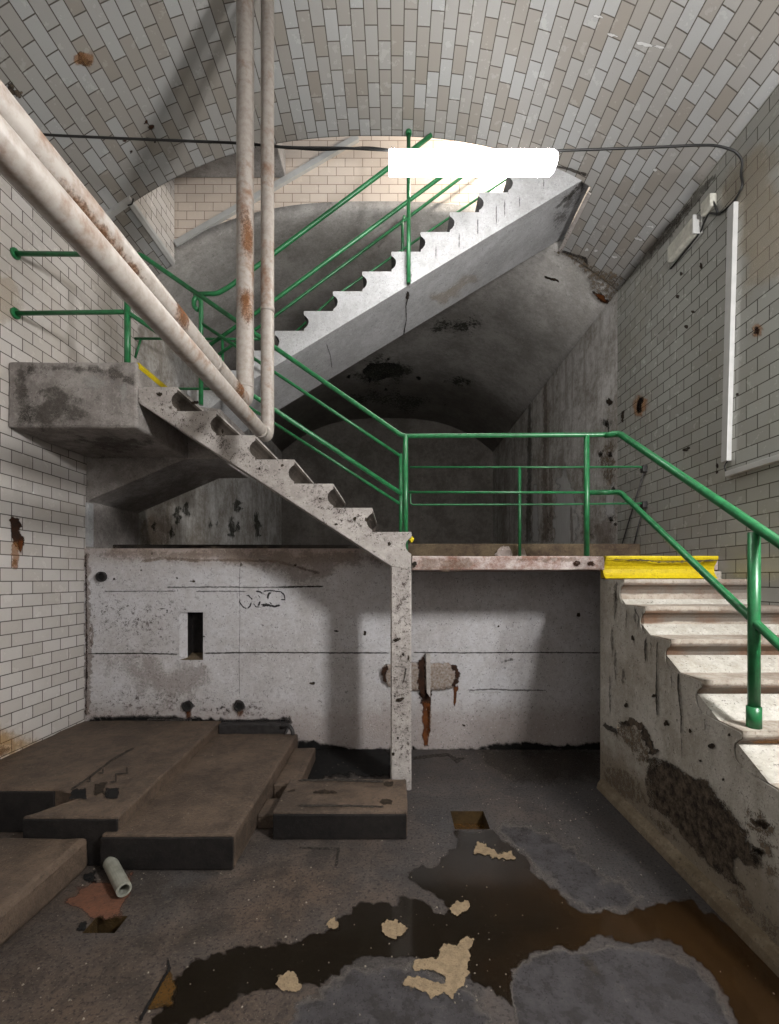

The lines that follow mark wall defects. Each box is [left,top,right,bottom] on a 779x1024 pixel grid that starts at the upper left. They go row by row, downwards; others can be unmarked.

crack [402,283,410,335]
corrosion [633,396,646,416]
corrosion [9,516,24,568]
water stain [169,502,190,539]
water stain [209,499,262,538]
corrosion [381,664,390,687]
corrosion [411,653,460,746]
spalling [602,703,779,943]